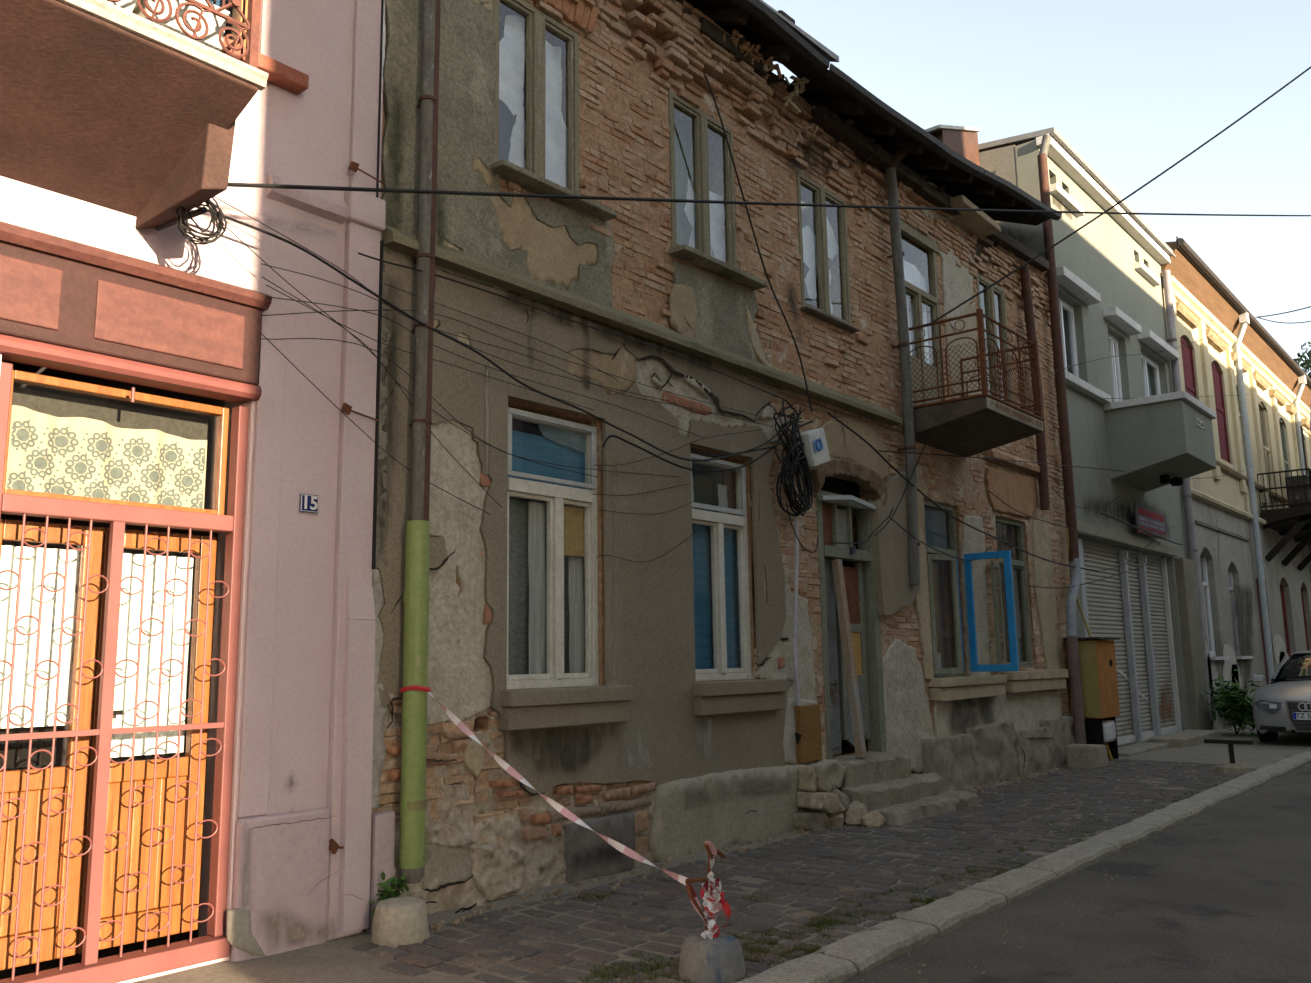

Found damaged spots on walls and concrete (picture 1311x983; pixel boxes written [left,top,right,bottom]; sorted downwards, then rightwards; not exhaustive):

flaking render [471,0,1071,760]
flaking render [371,696,402,843]
spalling [426,420,533,845]
flaking render [552,781,649,807]